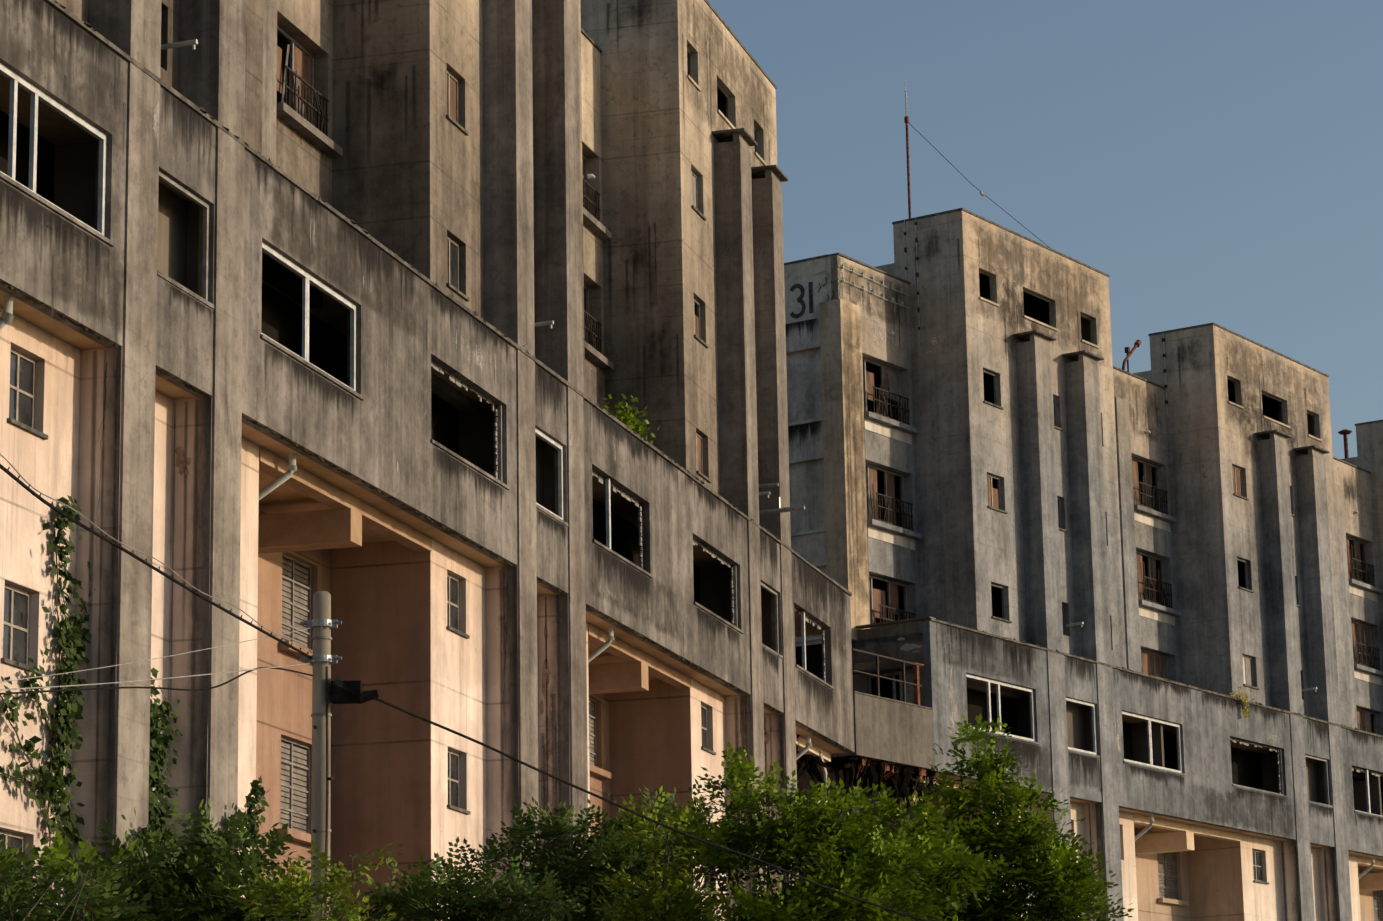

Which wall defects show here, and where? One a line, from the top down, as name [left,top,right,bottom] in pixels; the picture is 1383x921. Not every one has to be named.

damp [22,0,110,59]
damp [0,180,103,265]
damp [255,157,324,243]
damp [431,287,507,347]
damp [595,408,739,522]
damp [788,422,819,443]
damp [98,347,121,887]
damp [190,397,211,864]
damp [1120,670,1280,718]
damp [1069,752,1097,774]
damp [1129,765,1183,783]
damp [1095,803,1106,919]